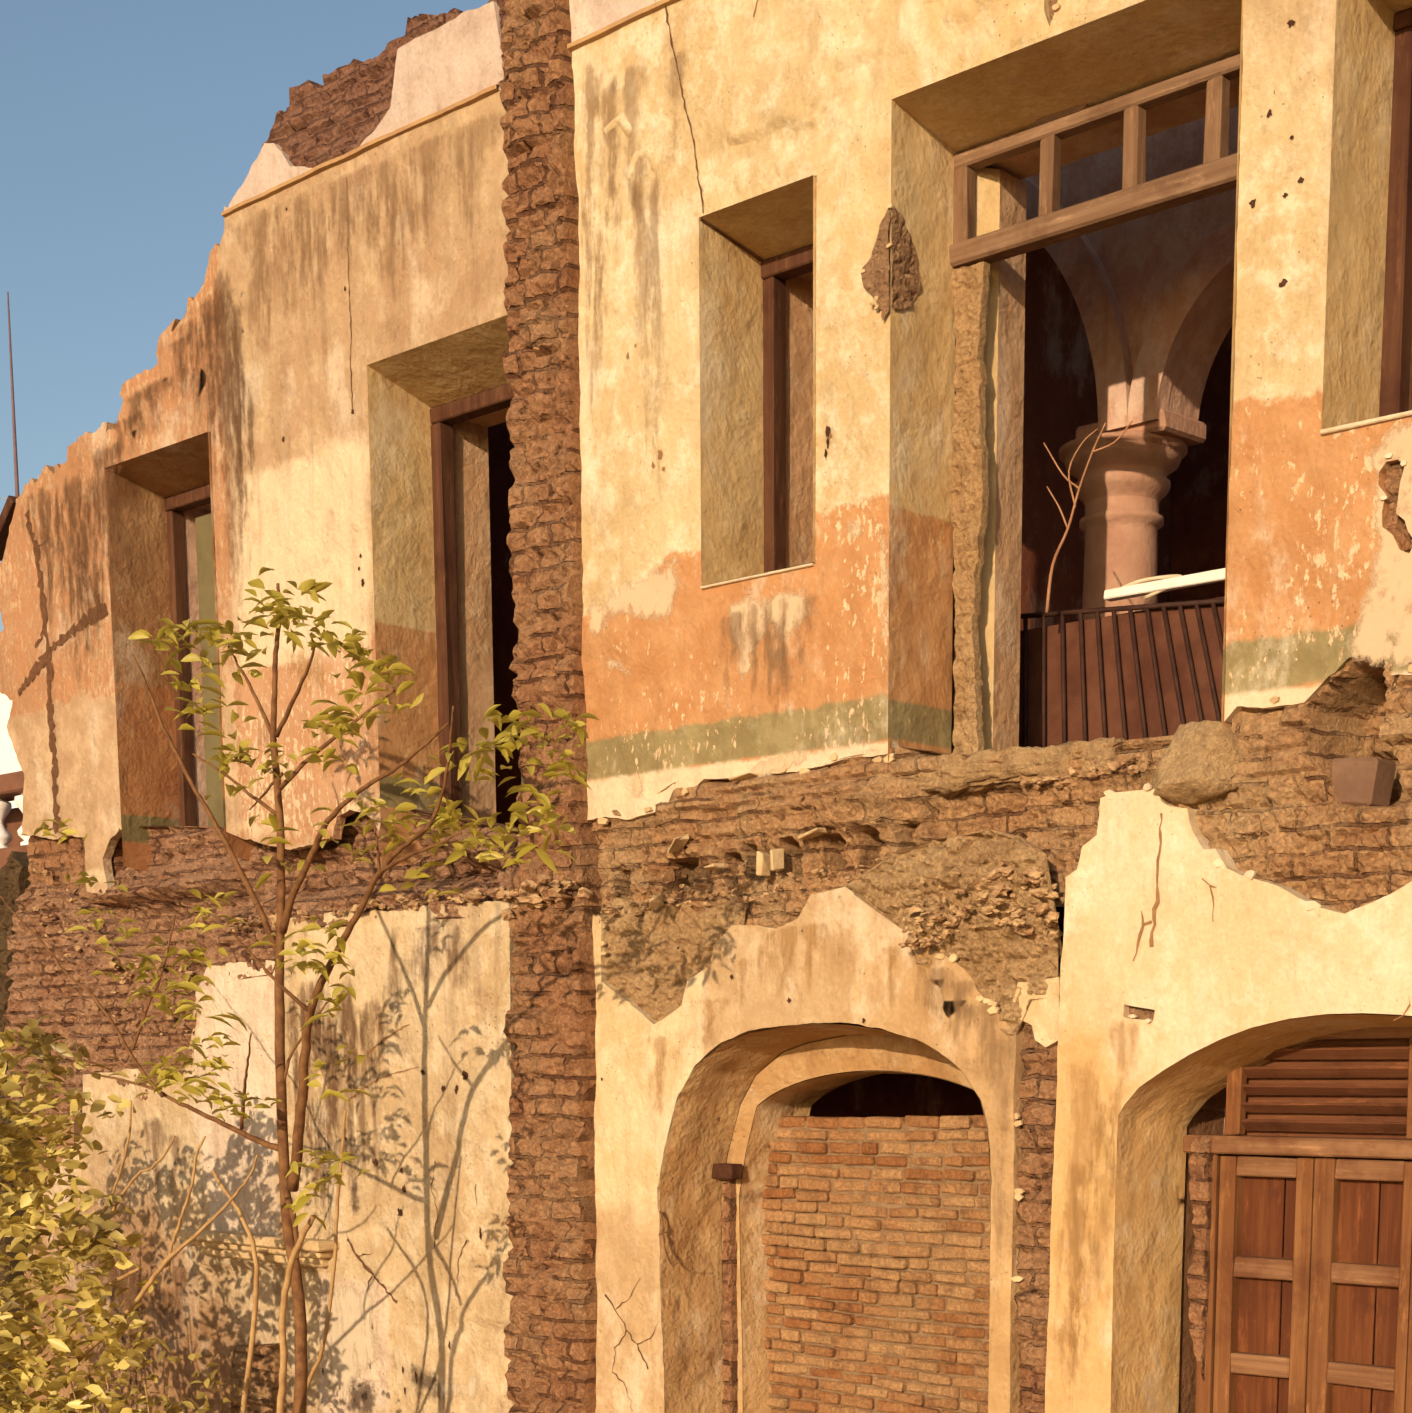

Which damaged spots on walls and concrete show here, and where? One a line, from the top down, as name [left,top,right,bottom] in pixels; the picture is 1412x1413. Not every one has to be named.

crack [654,0,764,262]
spalling [859,204,922,321]
peeling [588,558,676,634]
peeling [730,591,809,681]
spalling [1169,424,1412,913]
crack [1133,813,1162,961]
crack [1202,878,1217,919]
spalling [1,809,523,1116]
crack [659,1210,683,1266]
water stain [326,1284,378,1413]
water stain [411,1365,476,1398]
crack [604,1280,658,1407]